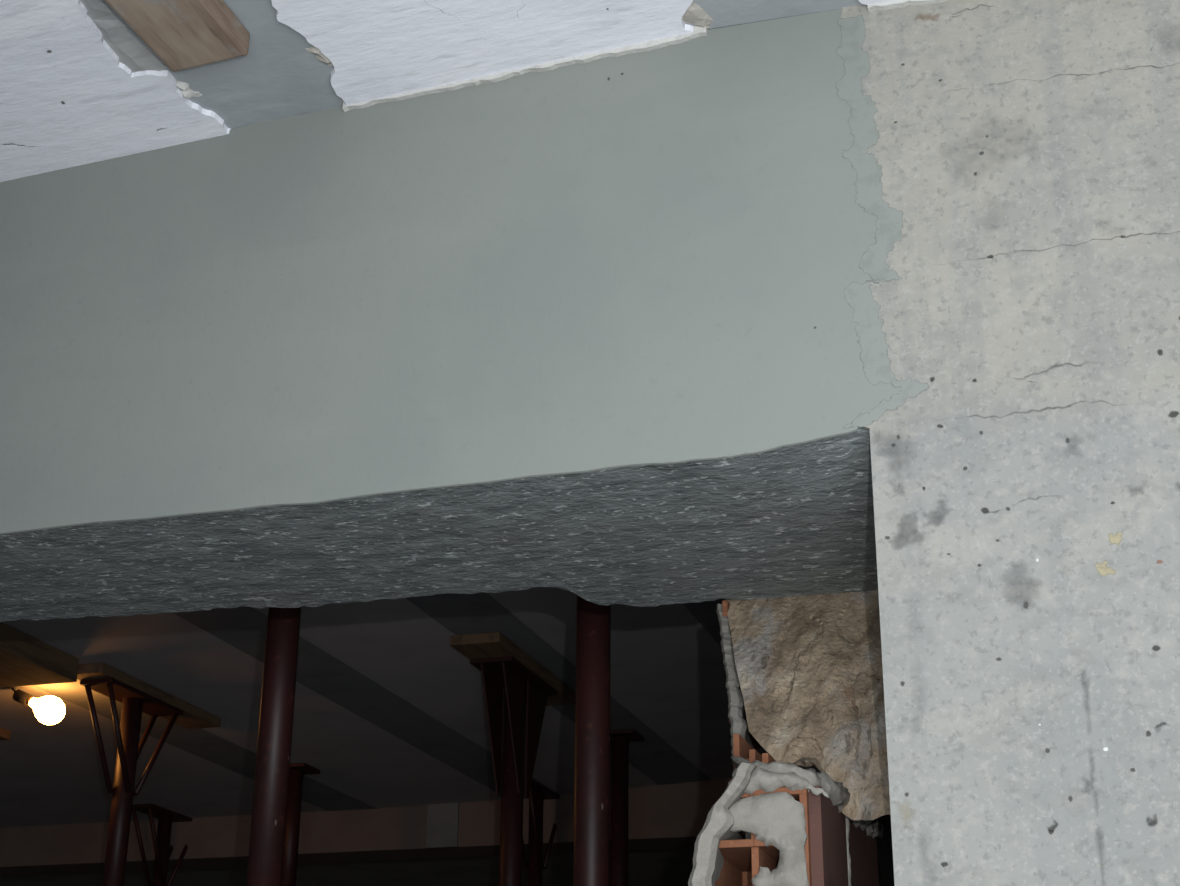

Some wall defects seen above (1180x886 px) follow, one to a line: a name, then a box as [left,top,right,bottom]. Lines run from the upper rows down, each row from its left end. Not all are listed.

flaking render [80,0,343,129]
flaking render [682,0,1180,886]